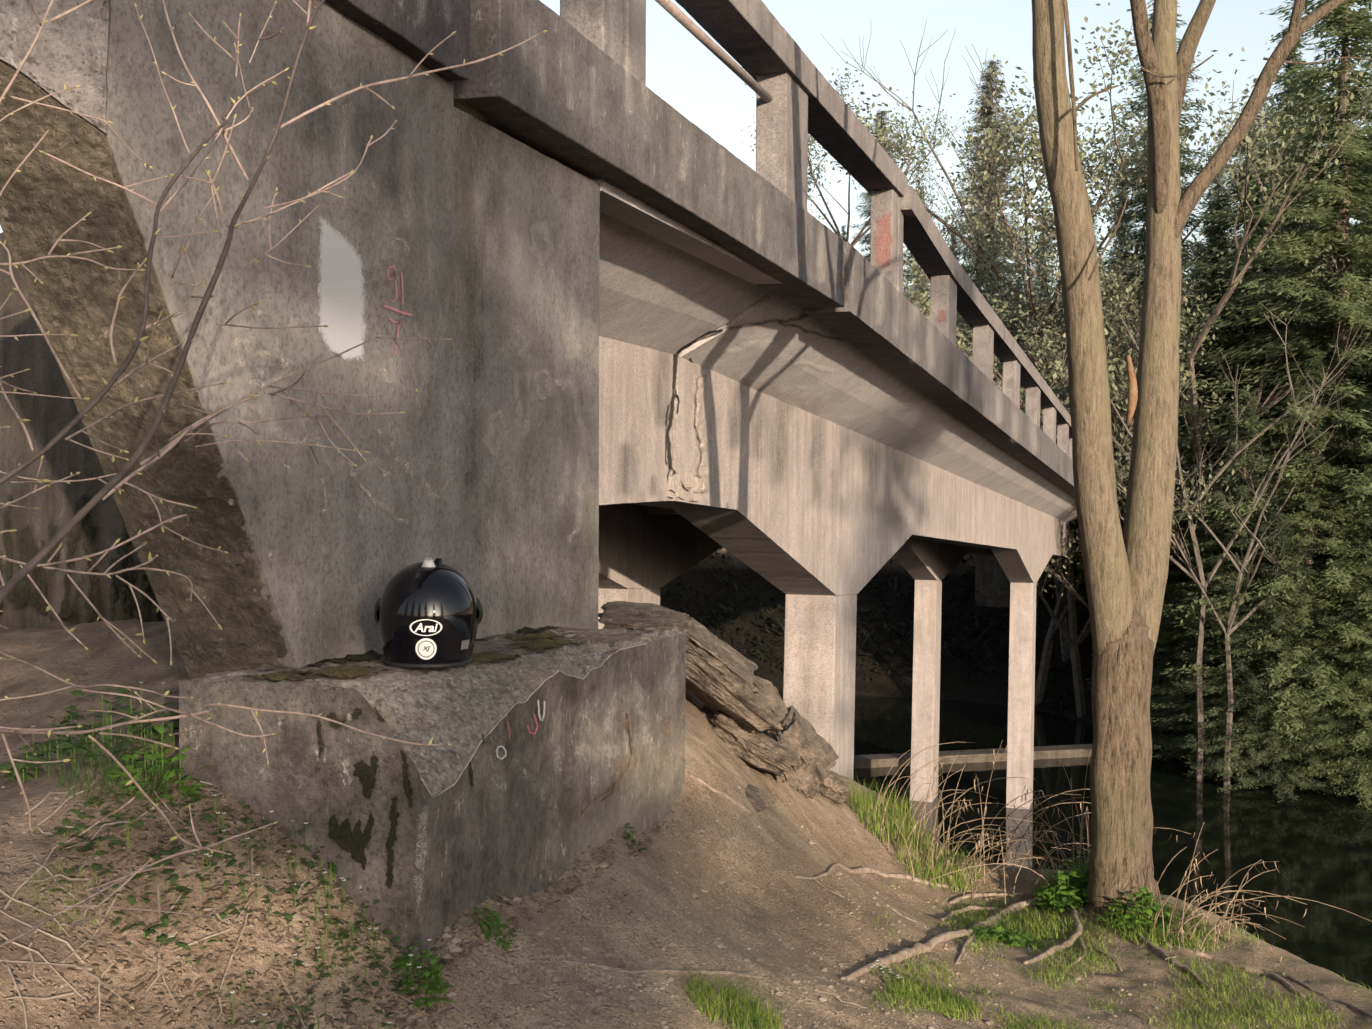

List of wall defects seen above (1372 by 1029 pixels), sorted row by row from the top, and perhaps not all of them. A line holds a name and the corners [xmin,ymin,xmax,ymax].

crack [665,315,843,491]